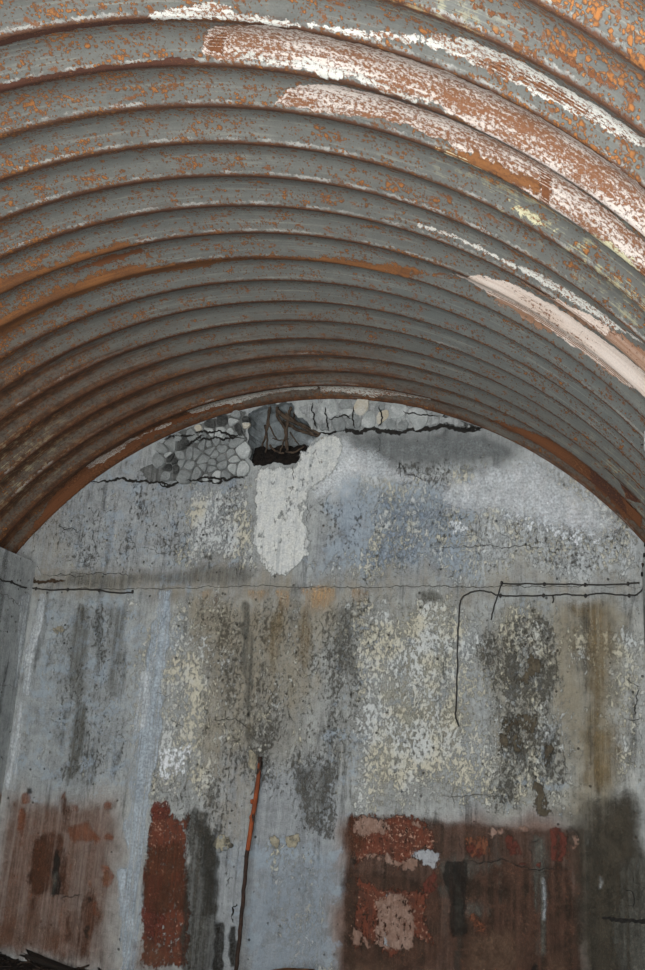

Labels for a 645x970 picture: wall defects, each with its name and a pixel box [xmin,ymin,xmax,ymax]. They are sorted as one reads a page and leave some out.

corrosion [0,18,155,46]
corrosion [0,56,199,93]
peeling [148,1,645,277]
corrosion [0,239,437,339]
peeling [417,223,645,397]
corrosion [33,386,431,530]
peeling [140,399,479,576]
crack [320,415,482,452]
water stain [68,668,86,778]
water stain [117,591,170,970]
water stain [578,603,645,970]
water stain [180,810,237,970]